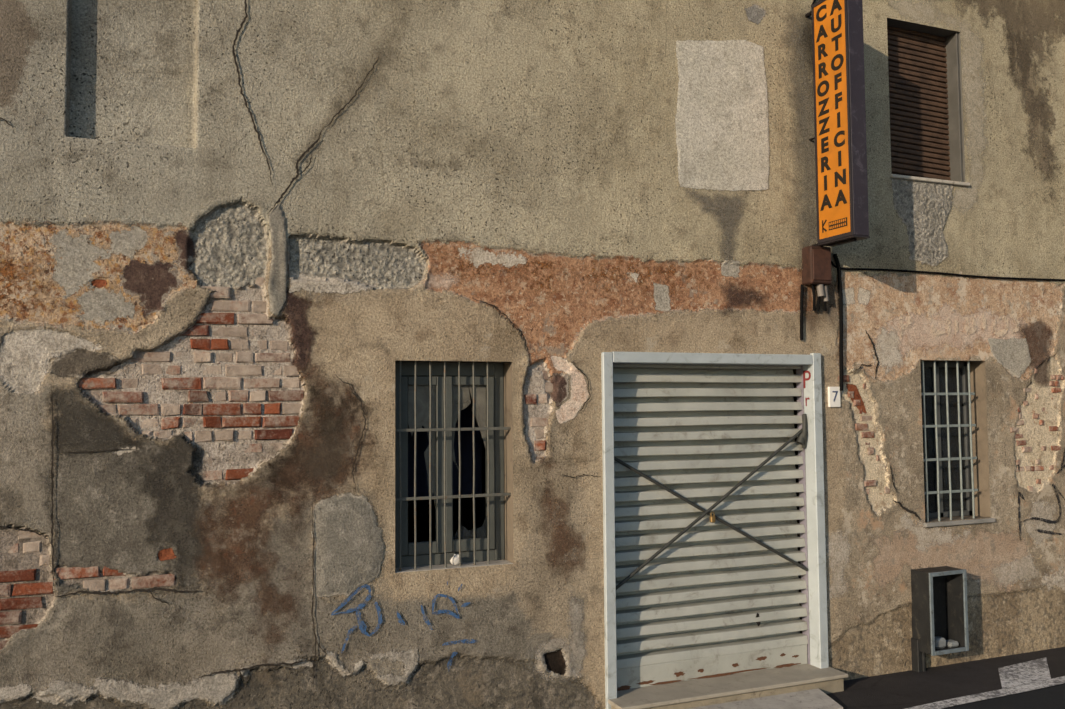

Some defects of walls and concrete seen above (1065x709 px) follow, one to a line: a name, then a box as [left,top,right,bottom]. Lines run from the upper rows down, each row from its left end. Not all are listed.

crack [232,0,379,214]
leakage [955,0,1065,201]
flaking render [0,202,307,486]
peeling [287,234,813,467]
peeling [835,0,1065,593]
flaking render [0,526,177,650]
peeling [0,666,251,709]
peeling [280,648,418,686]
flaking render [537,597,585,679]
flaking render [541,489,584,570]
peeling [825,532,849,597]